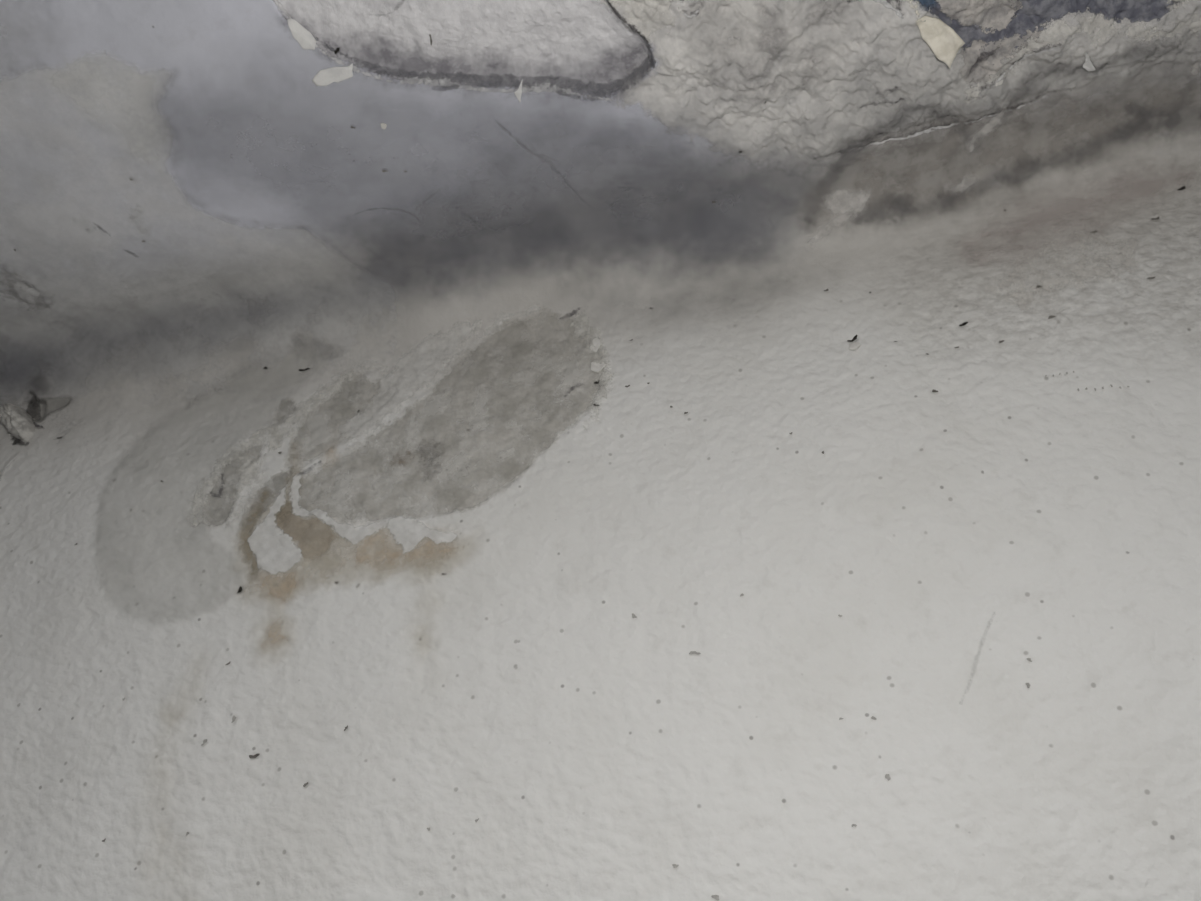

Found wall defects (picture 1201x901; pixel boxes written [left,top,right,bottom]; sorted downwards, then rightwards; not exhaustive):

water stain [0,60,394,392]
flaking render [605,0,1201,175]
water stain [815,90,1192,239]